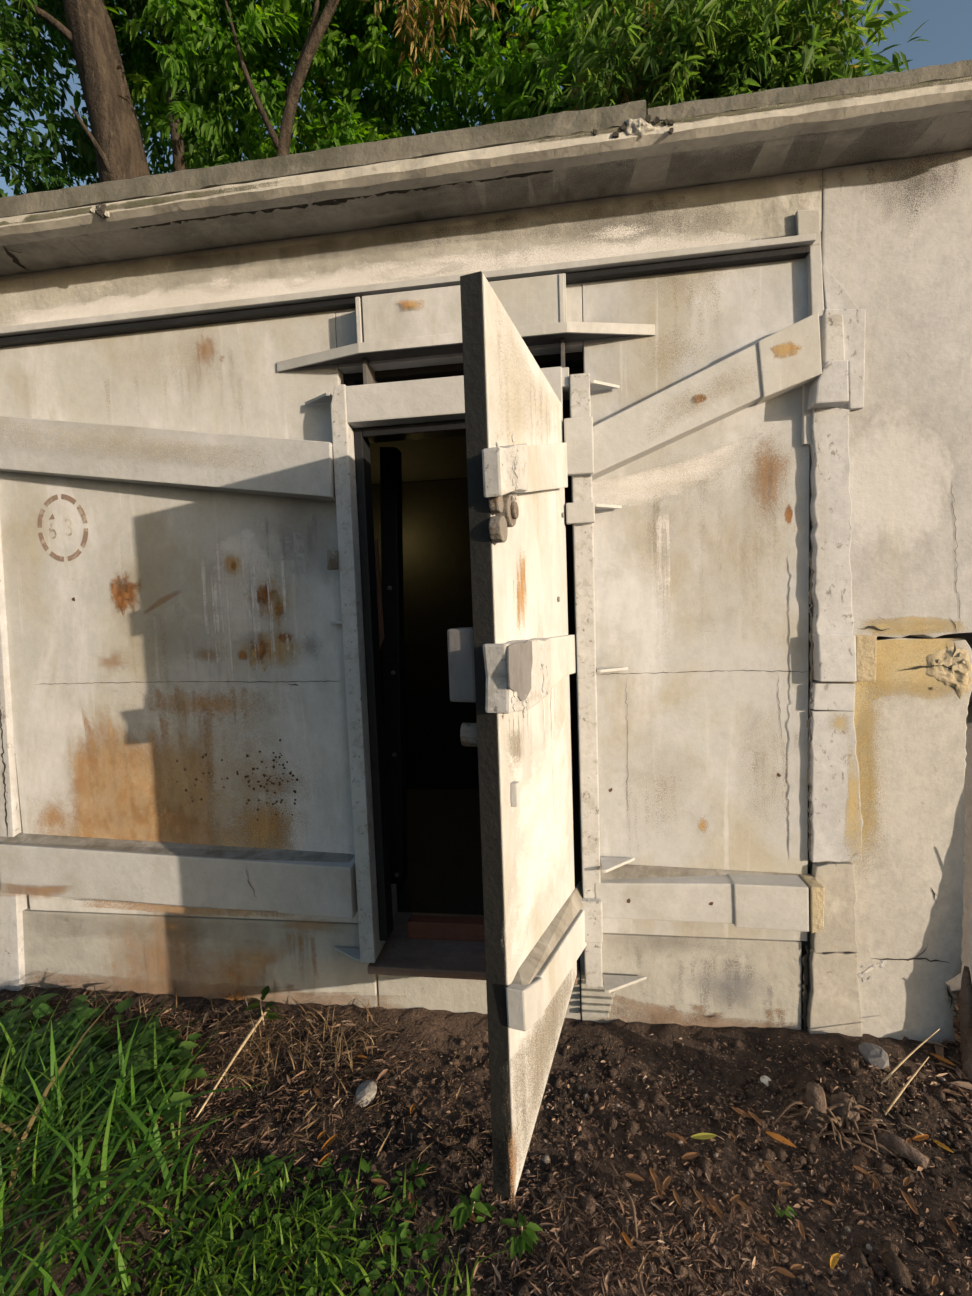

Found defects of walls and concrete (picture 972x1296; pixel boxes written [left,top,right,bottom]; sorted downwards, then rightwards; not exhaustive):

spalling [593,115,674,138]
crack [130,170,553,229]
rust [770,341,802,358]
crack [950,488,960,633]
rust [110,571,141,618]
rust [237,572,302,671]
rust [513,550,527,631]
spalling [901,640,972,699]
crack [0,709,8,837]
leakage [820,616,969,880]
crack [878,943,949,963]